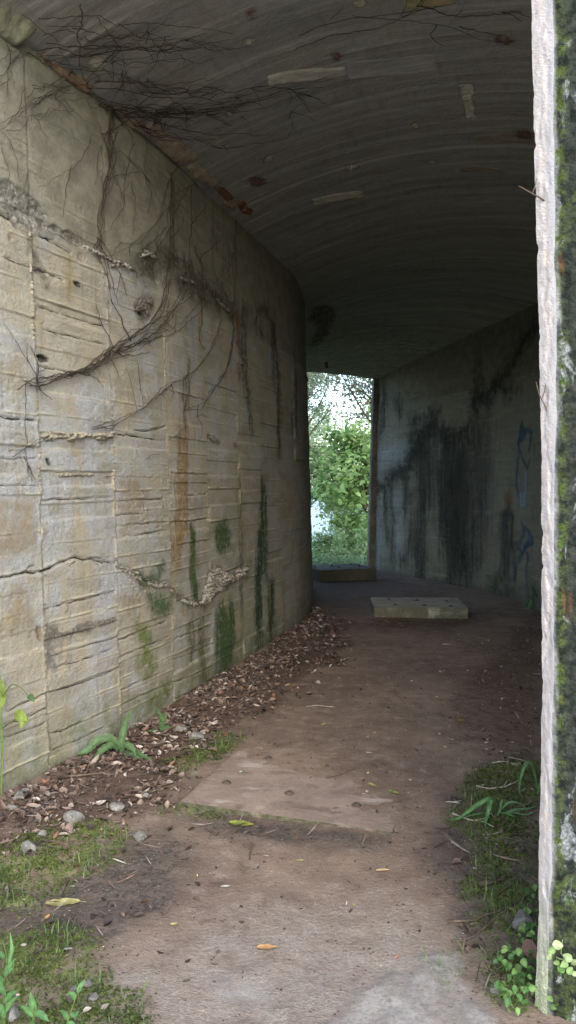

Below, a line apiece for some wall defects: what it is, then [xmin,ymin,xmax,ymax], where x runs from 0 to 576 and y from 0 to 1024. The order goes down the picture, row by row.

crack [0,557,112,578]
water stain [375,322,536,591]